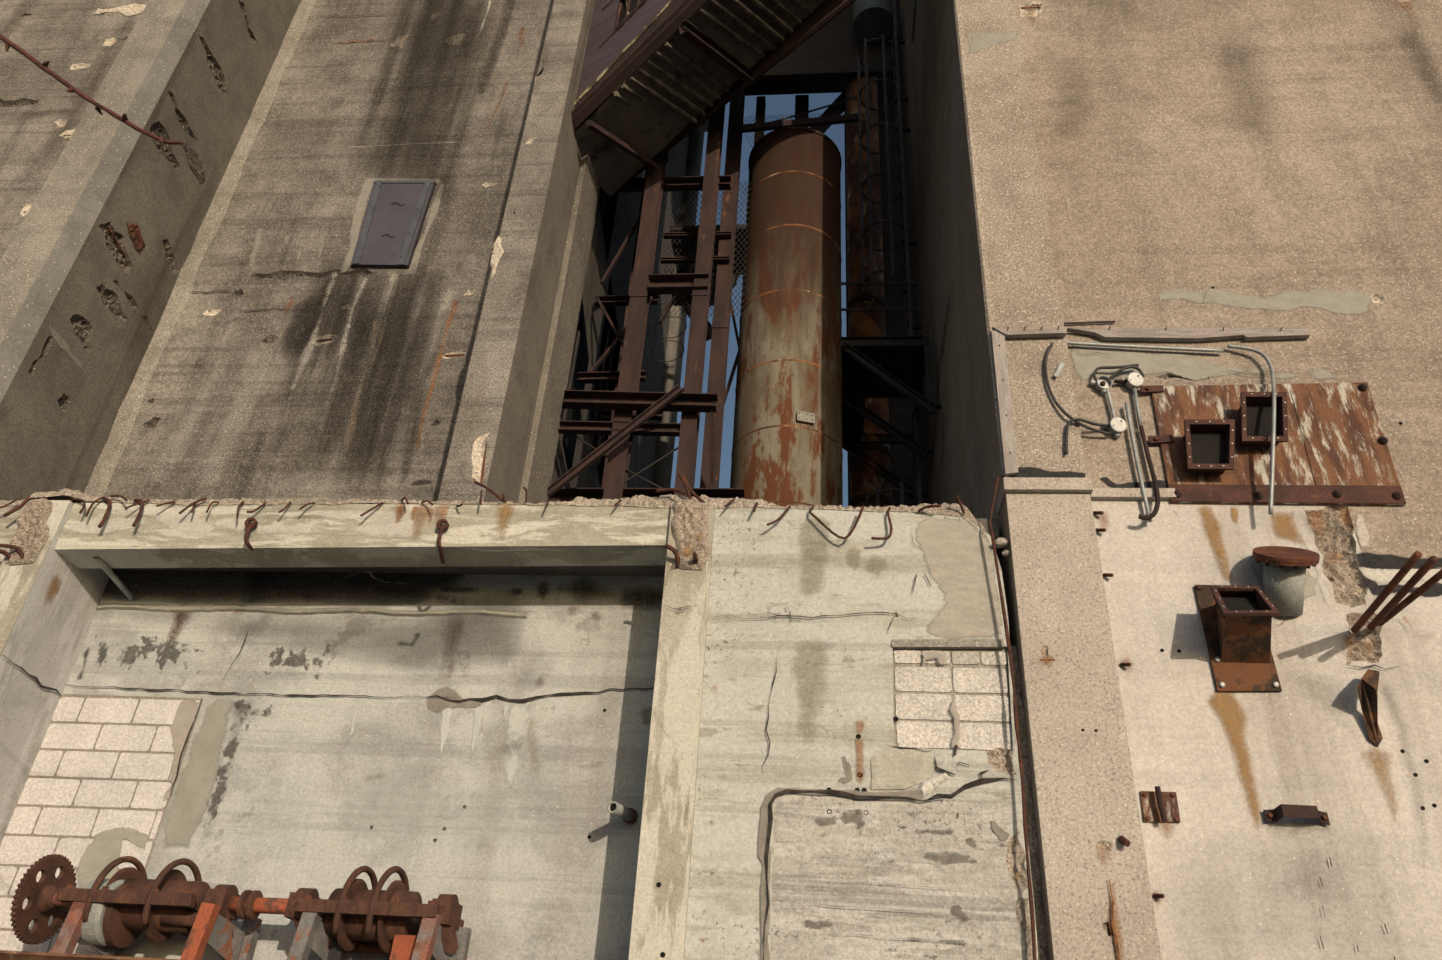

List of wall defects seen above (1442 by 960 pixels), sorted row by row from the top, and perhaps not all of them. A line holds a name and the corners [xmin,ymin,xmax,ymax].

spalling [0,98,39,107]
spalling [54,119,75,139]
spalling [96,222,153,335]
water stain [285,0,514,474]
corrosion [1201,508,1238,578]
spalling [1305,505,1442,665]
water stain [78,636,202,678]
water stain [265,644,332,680]
crack [4,631,672,796]
spalling [0,433,1037,960]
crack [663,526,1016,960]
corrosion [1210,692,1259,822]